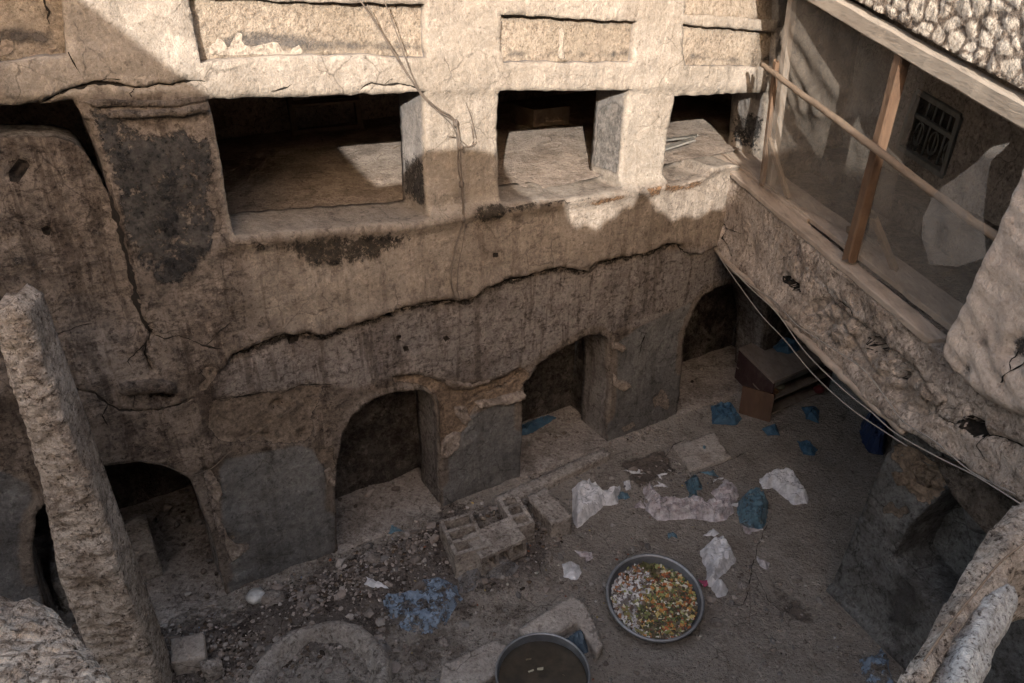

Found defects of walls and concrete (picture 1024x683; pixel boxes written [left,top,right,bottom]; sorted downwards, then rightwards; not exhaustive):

crack [359,79,421,91]
crack [108,195,232,373]
leakage [257,232,411,266]
spalling [393,368,529,458]